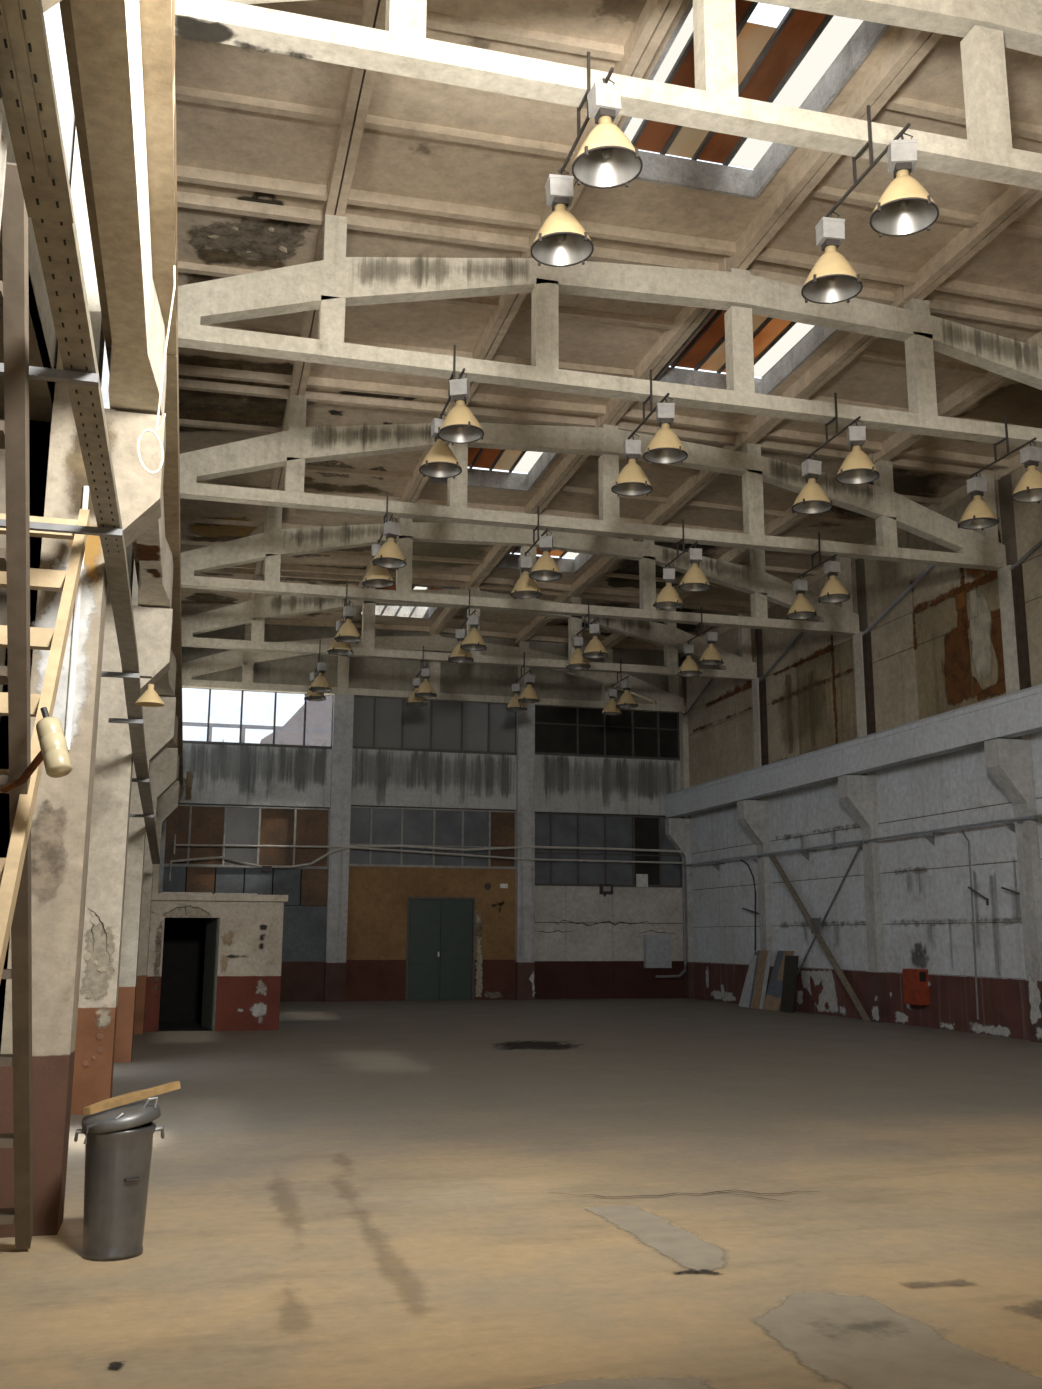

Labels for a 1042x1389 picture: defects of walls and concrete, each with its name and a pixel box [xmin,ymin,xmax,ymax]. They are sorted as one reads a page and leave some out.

damp [188,192,310,284]
peeling [237,980,267,1022]
peeling [705,967,736,1002]
peeling [797,970,846,1015]
peeling [872,992,911,1023]
peeling [1028,975,1042,1040]
peeling [940,1022,1011,1037]